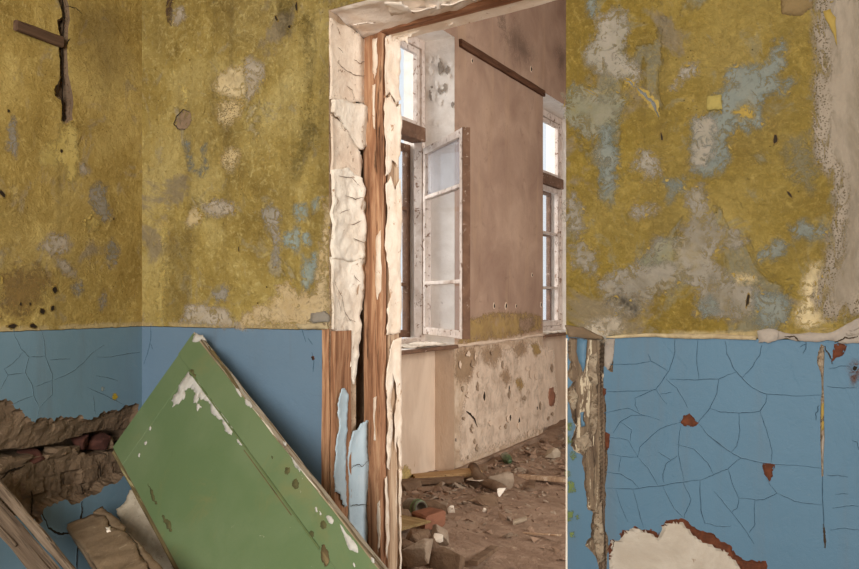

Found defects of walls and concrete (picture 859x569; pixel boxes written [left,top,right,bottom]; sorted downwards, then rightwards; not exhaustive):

spalling [0,398,139,524]
crack [0,327,153,418]
peeling [181,0,480,569]
peeling [455,0,859,569]
crack [605,340,859,548]